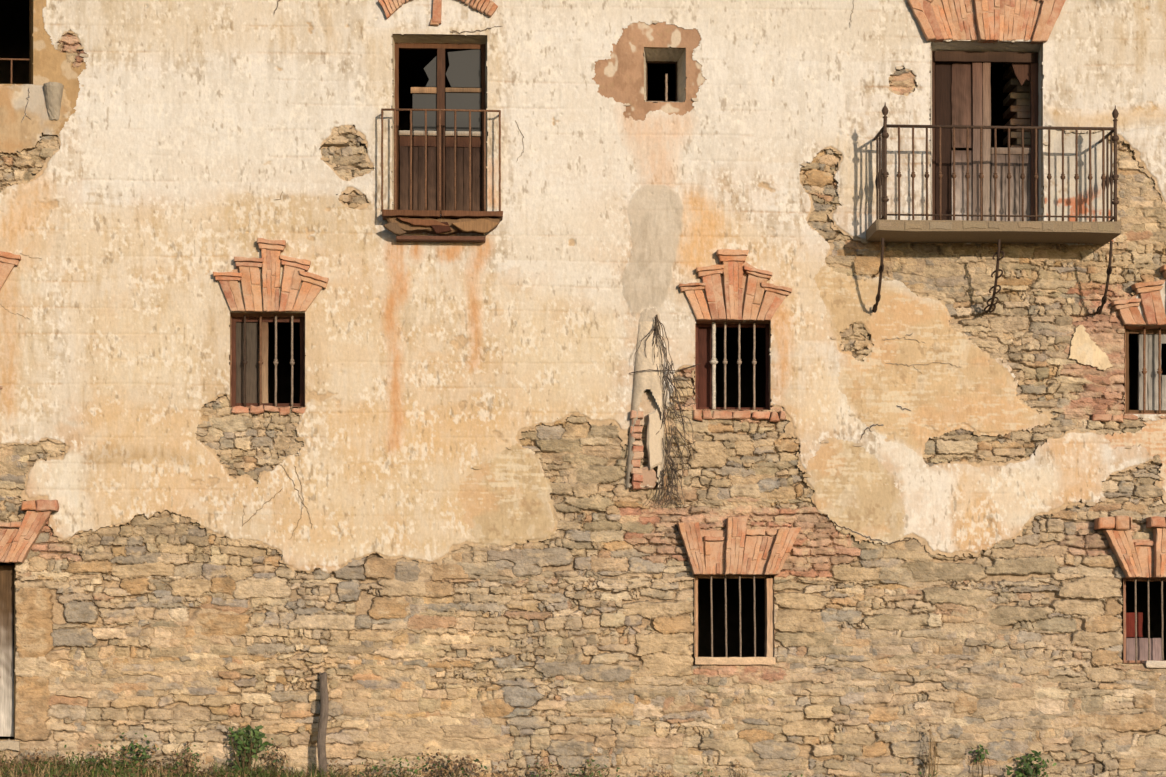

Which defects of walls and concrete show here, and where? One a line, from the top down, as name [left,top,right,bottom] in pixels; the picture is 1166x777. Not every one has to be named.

peeling [0,0,89,192]
peeling [592,20,707,121]
flaking render [320,125,375,208]
corrosion [379,232,497,458]
flaking render [799,130,1166,559]
flaking render [0,439,66,529]
flaking render [29,510,277,556]
flaking render [195,394,304,488]
flaking render [458,367,932,557]